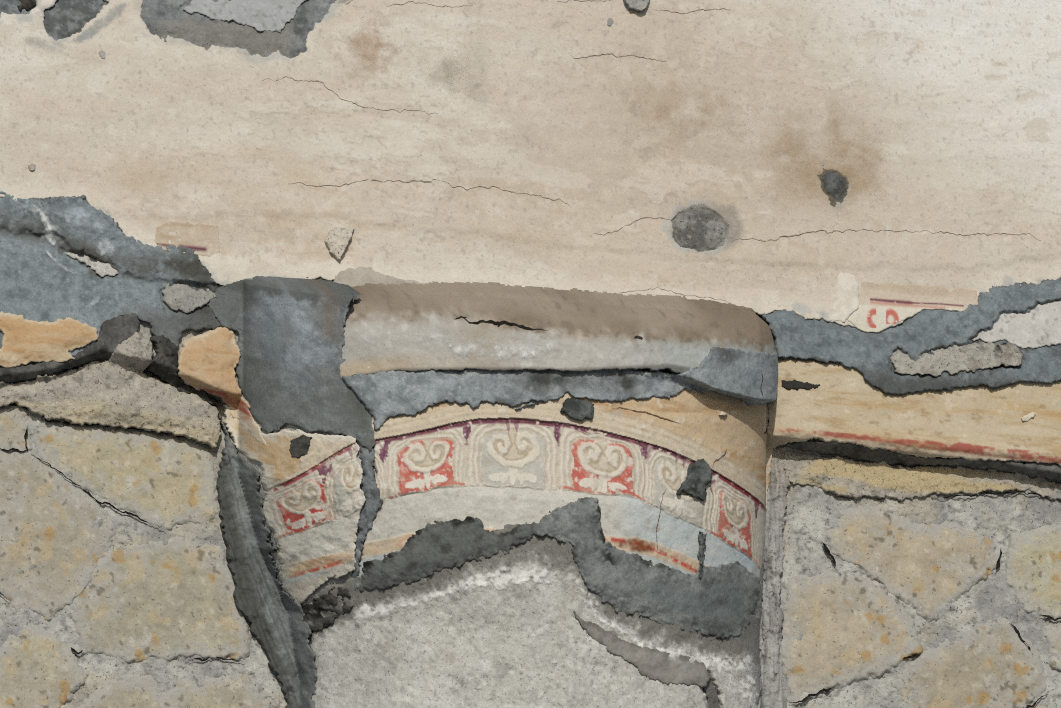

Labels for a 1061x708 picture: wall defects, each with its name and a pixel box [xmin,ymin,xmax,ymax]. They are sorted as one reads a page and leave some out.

flaking render [65,252,119,277]
flaking render [161,283,217,313]
flaking render [827,272,860,323]
flaking render [890,301,1061,377]
spalling [302,586,353,632]